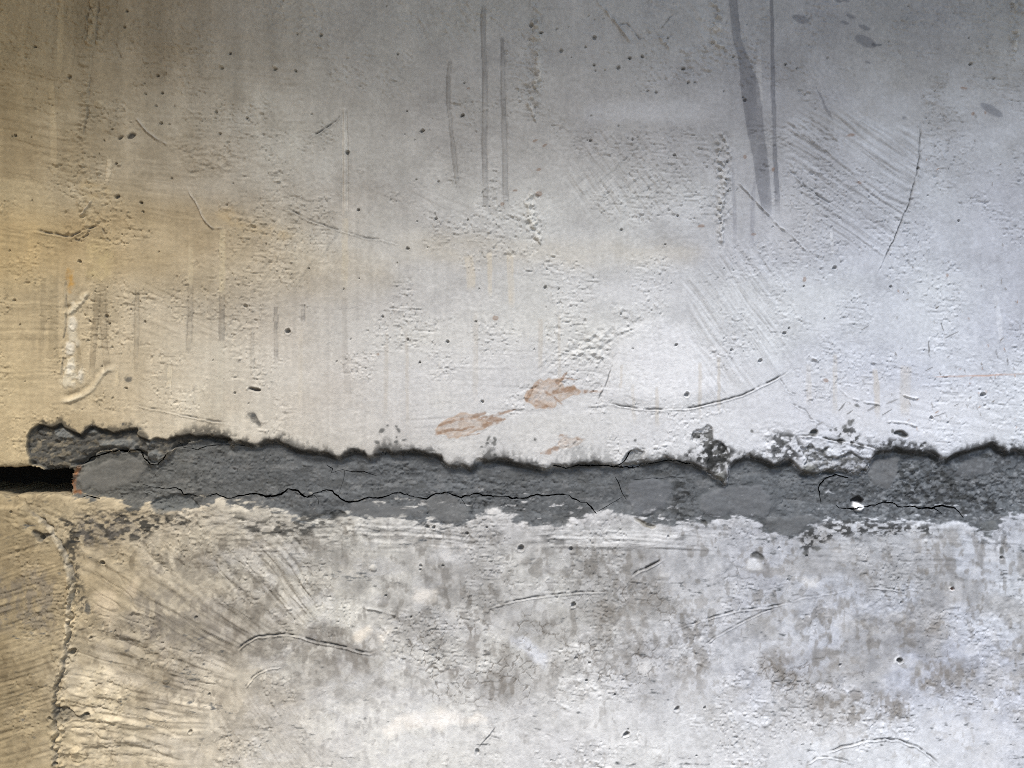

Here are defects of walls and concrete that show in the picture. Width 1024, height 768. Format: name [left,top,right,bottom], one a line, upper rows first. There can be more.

damp [444,59,461,200]
damp [480,4,510,217]
damp [728,0,781,251]
spalling [25,424,228,470]
crack [85,442,691,514]
corrosion [434,371,601,440]
corrosion [539,433,585,456]
spalling [690,423,729,485]
spalling [779,379,870,478]
flaking render [849,494,866,512]
crack [818,474,964,518]
flaking render [886,420,918,437]